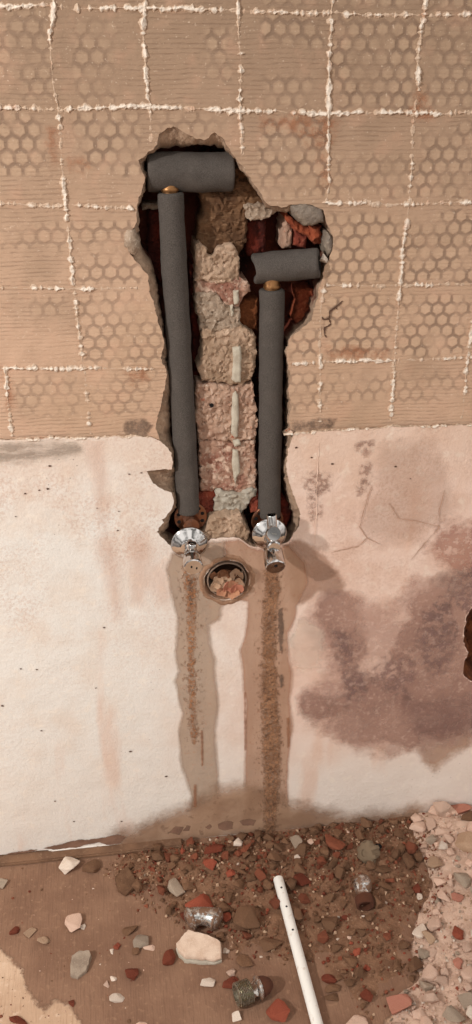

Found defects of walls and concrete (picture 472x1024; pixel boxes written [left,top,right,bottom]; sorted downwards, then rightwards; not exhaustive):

spalling [128,126,333,548]
corrosion [180,567,203,766]
leakage [0,527,472,1024]
corrosion [244,572,290,832]
crack [334,486,445,559]
spalling [463,608,472,681]